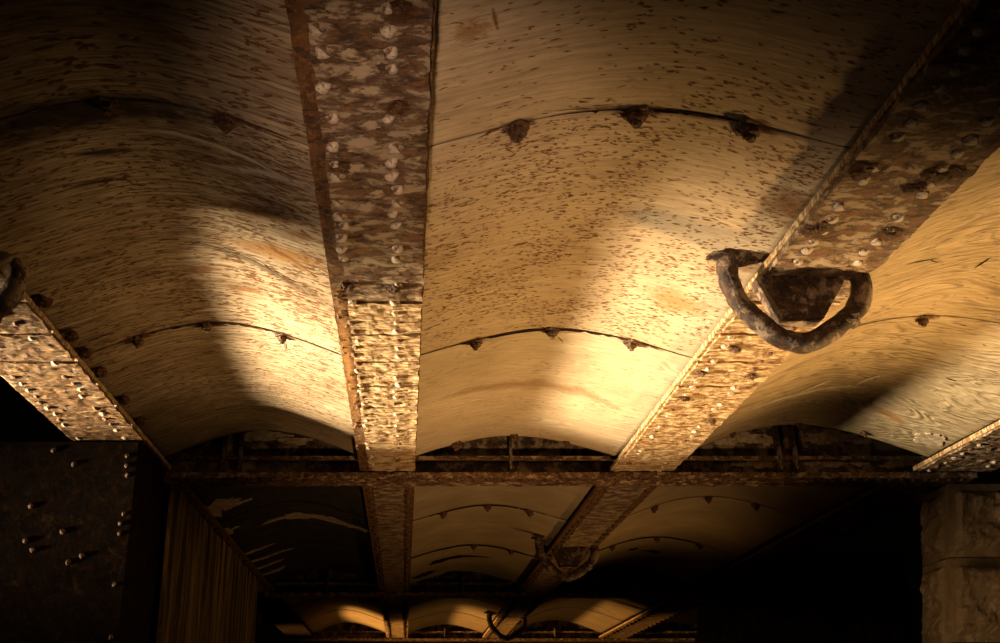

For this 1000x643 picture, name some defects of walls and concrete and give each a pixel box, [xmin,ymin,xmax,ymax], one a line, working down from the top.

rust [386,0,416,21]
rust [385,99,408,117]
rust [421,0,901,356]
rust [901,165,969,194]
rust [0,0,361,453]
rust [875,226,906,241]